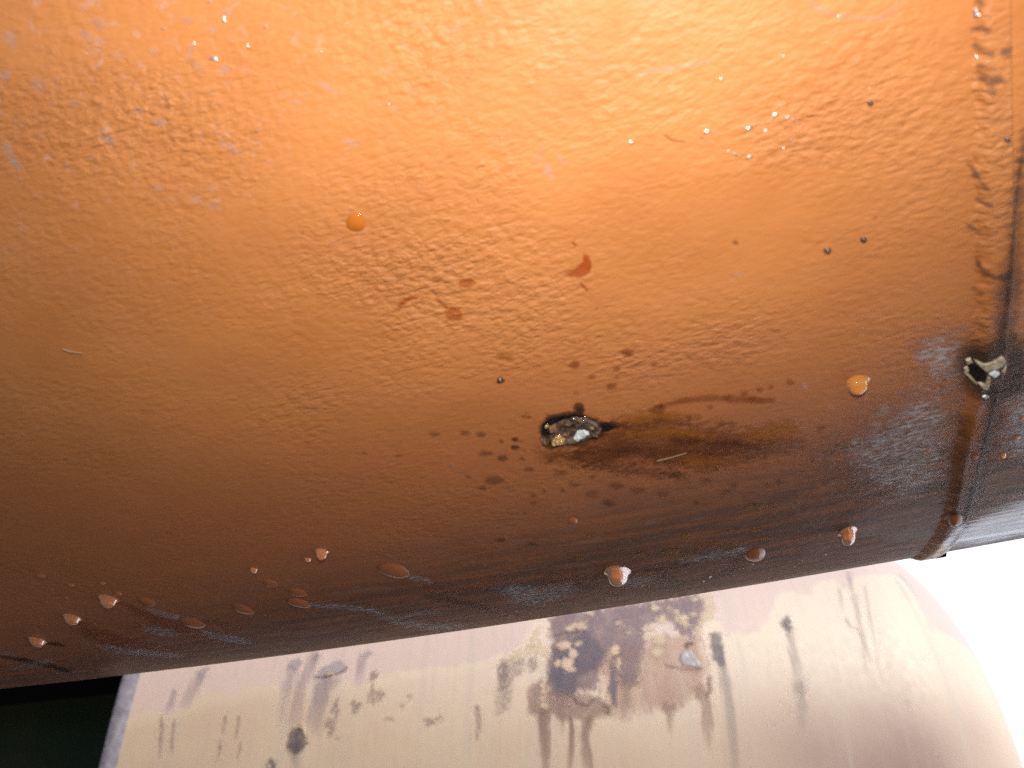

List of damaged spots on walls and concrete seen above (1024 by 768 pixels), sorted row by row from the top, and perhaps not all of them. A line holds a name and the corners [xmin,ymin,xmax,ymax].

corrosion [573,242,591,290]
peeling [960,340,1024,401]
corrosion [540,403,586,446]